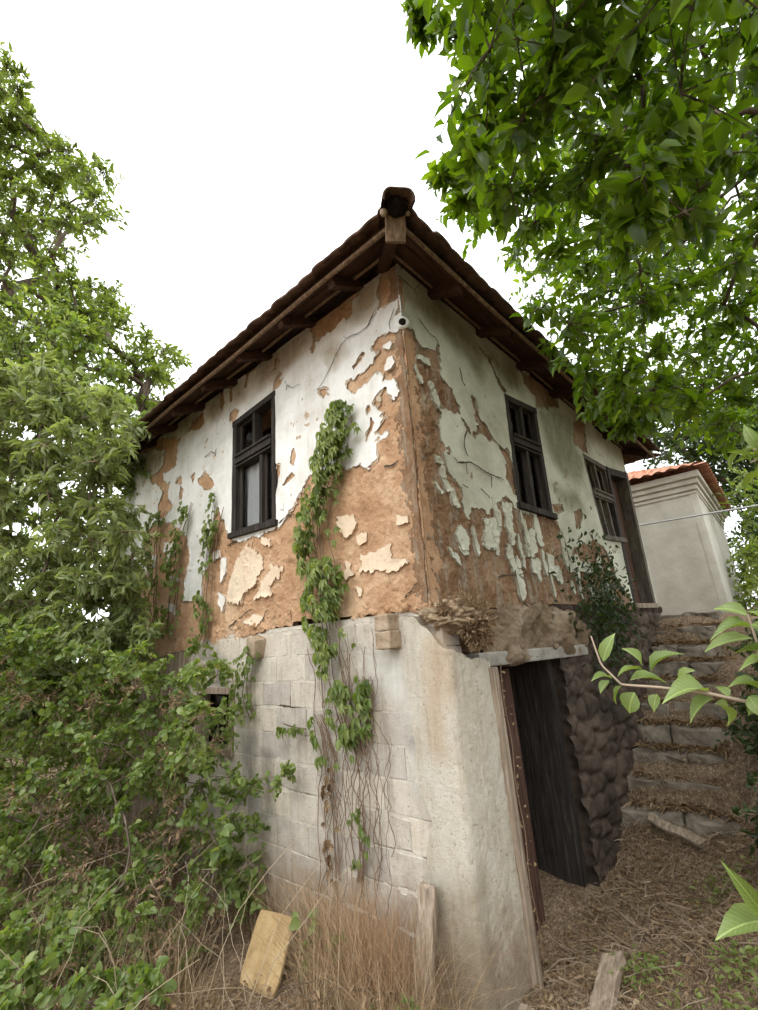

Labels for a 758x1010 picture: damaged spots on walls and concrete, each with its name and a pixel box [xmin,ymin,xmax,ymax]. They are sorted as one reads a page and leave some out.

spalling [139,329,633,659]
crack [454,430,504,498]